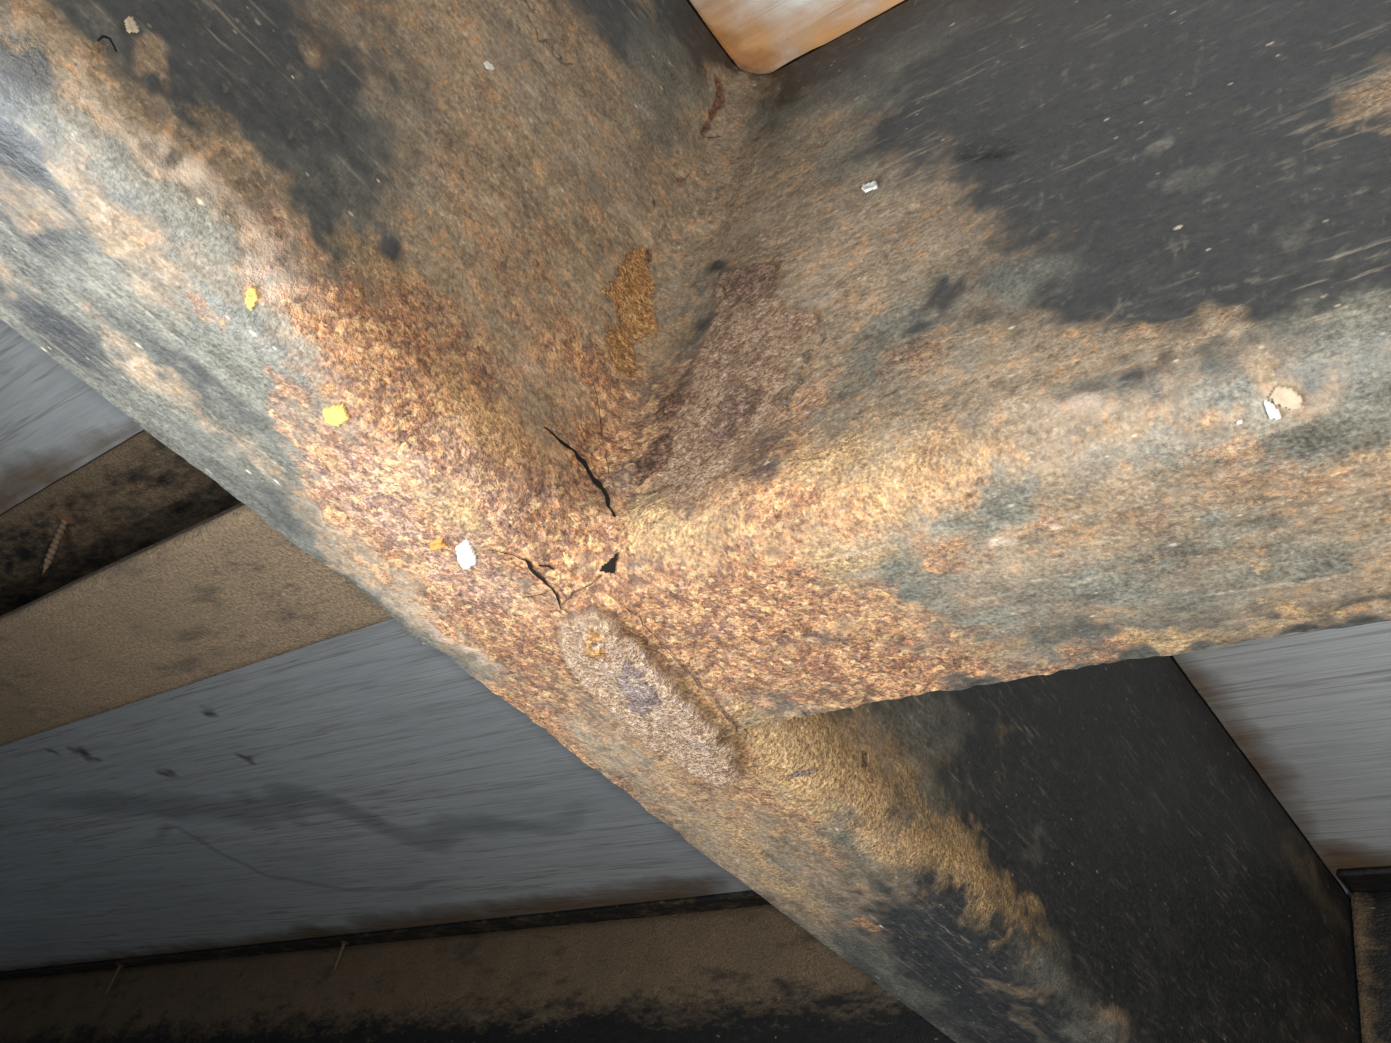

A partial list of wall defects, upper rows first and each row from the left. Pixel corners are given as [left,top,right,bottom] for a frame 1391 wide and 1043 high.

corrosion [696,0,904,74]
corrosion [600,246,658,380]
crack [544,355,616,517]
corrosion [662,263,825,504]
crack [491,550,602,609]
corrosion [788,770,816,779]